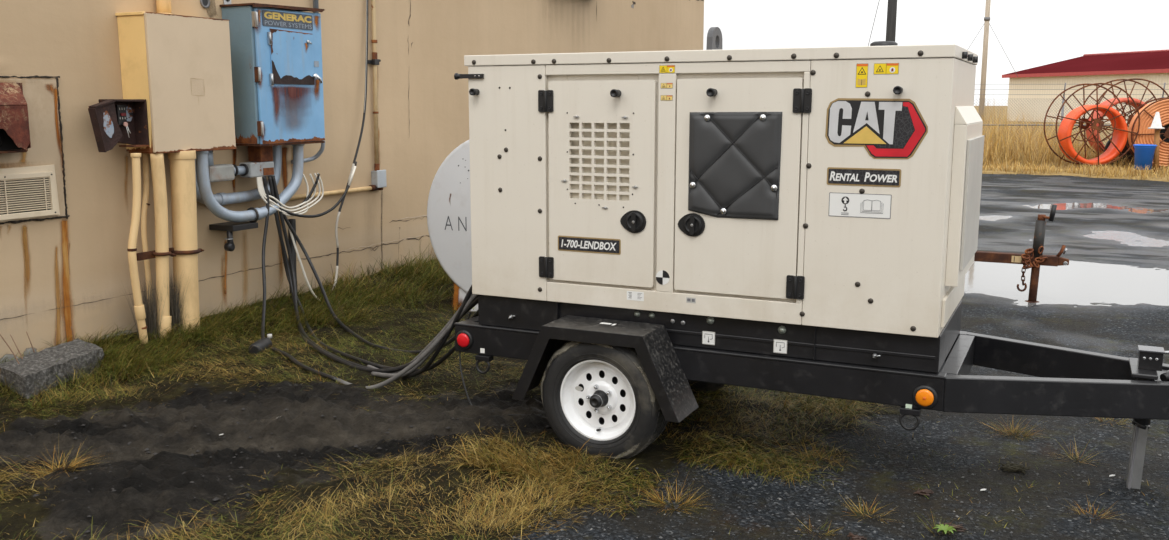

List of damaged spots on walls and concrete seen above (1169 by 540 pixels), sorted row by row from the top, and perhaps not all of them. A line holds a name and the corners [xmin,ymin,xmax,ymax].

rust [55,220,73,345]